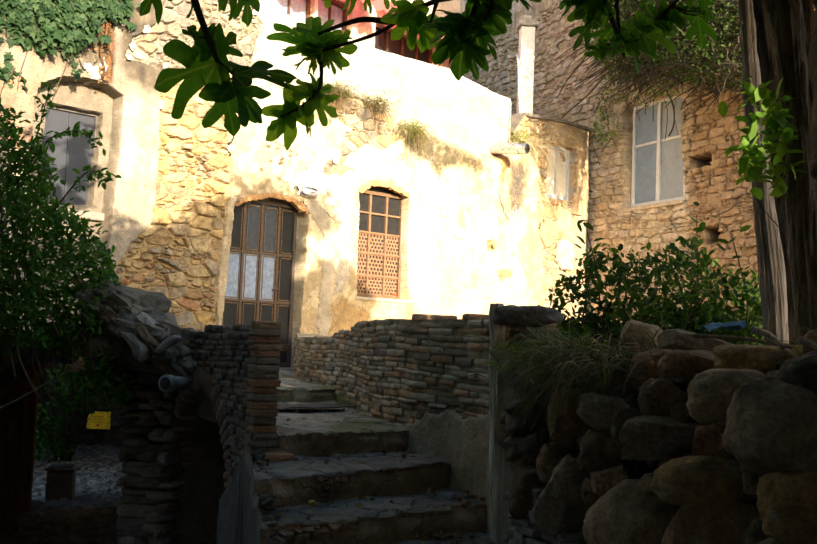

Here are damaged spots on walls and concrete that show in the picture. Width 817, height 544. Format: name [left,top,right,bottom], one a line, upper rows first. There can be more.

spalling [323,91,403,175]
water stain [509,163,529,244]
peeling [518,218,576,306]